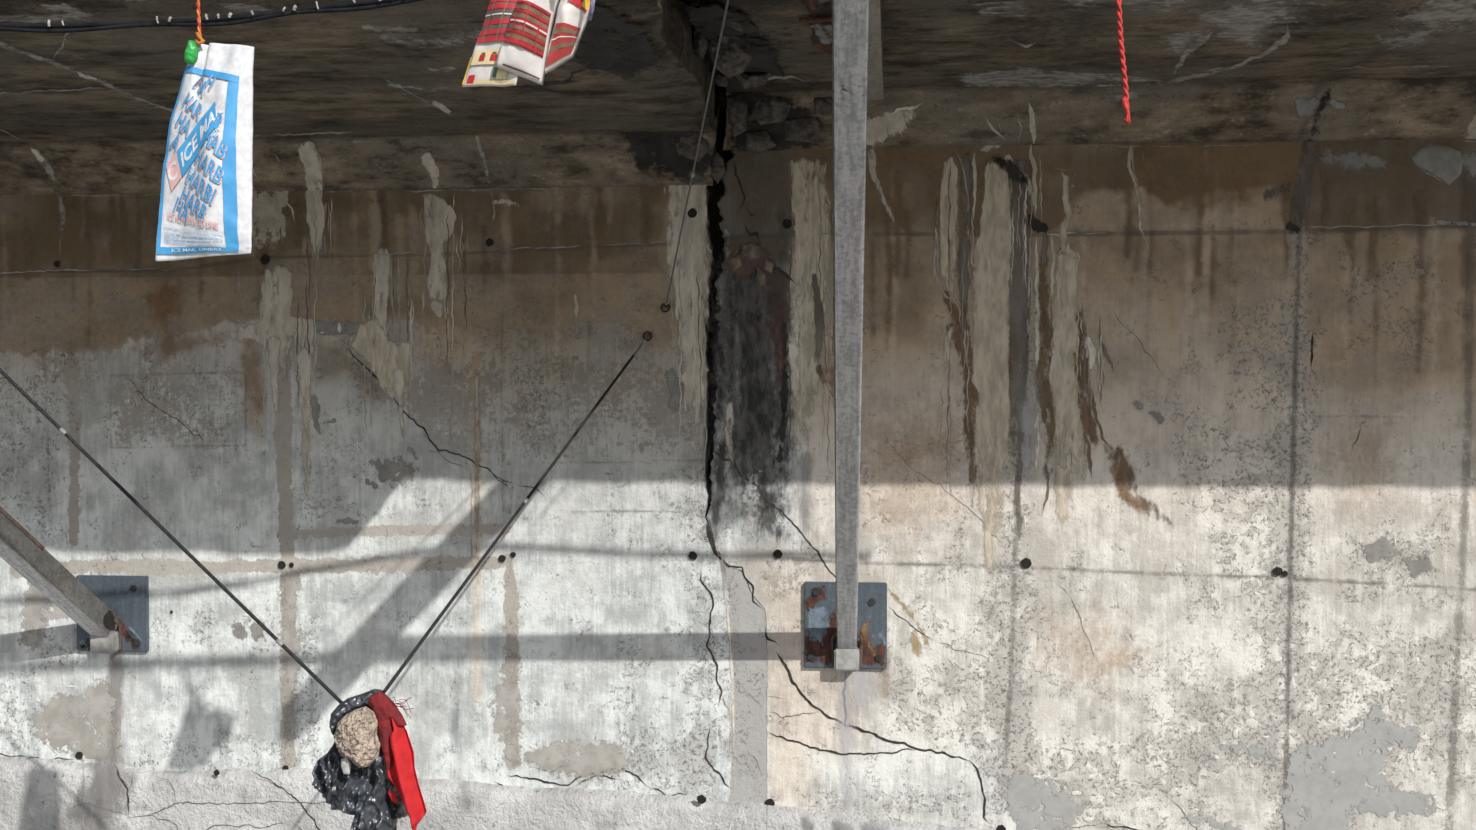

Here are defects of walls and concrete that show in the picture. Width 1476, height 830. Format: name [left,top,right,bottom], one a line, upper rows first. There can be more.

spalling [570,5,664,82]
spalling [685,0,833,153]
leakage [866,103,922,221]
leakage [933,0,1319,575]
leakage [352,135,582,582]
leakage [613,158,834,775]
crack [679,0,1001,823]
rust [803,585,837,665]
rust [858,621,887,666]
crack [72,765,322,830]
crack [496,764,686,796]
peeling [1214,689,1443,830]